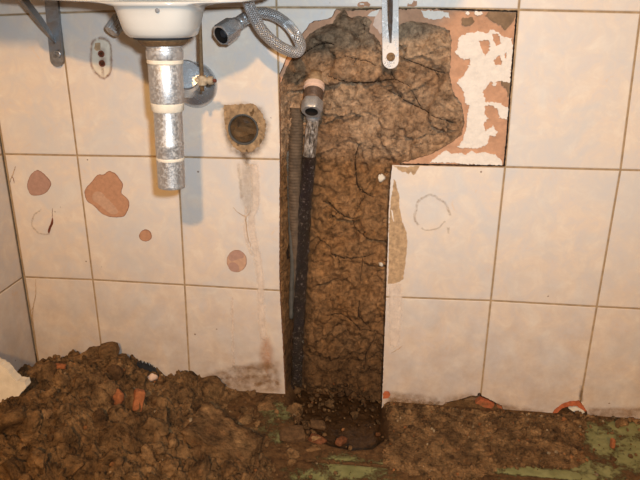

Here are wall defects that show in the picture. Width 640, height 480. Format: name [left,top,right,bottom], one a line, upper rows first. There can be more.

crack [328,56,453,123]
crack [323,146,371,237]
spalling [280,1,517,401]
crack [312,238,375,279]
crack [326,301,376,369]